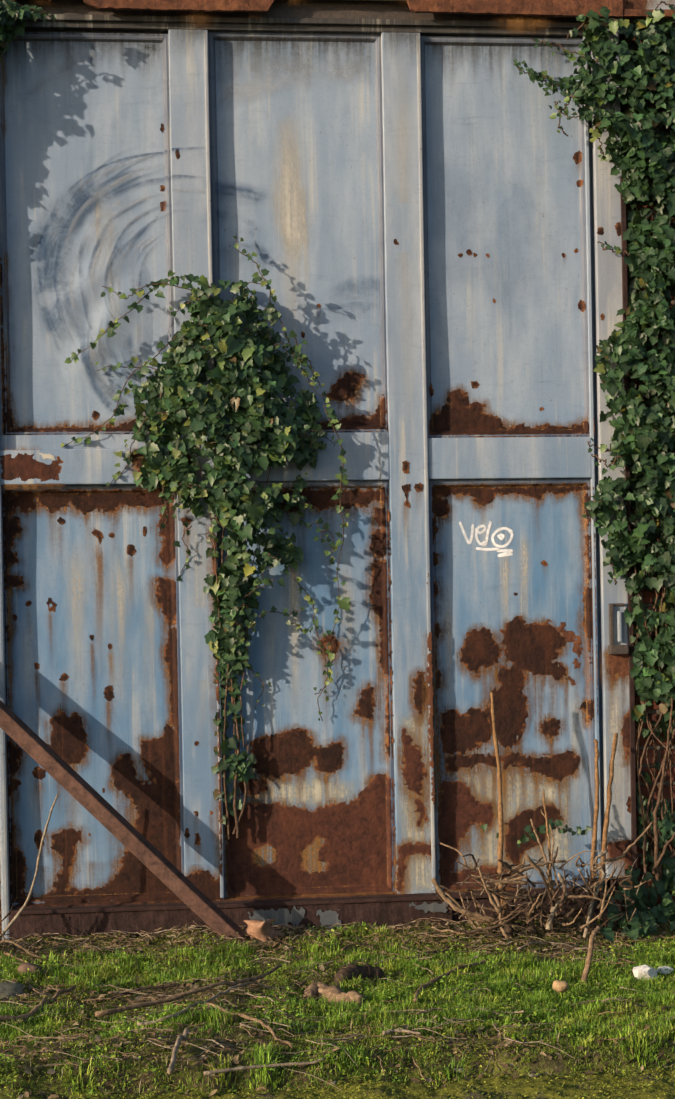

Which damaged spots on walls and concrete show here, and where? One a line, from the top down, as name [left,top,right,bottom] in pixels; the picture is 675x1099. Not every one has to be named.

corrosion [623,0,646,10]
corrosion [0,255,629,901]
corrosion [0,735,182,941]
corrosion [606,840,638,882]
peeling [248,906,342,930]